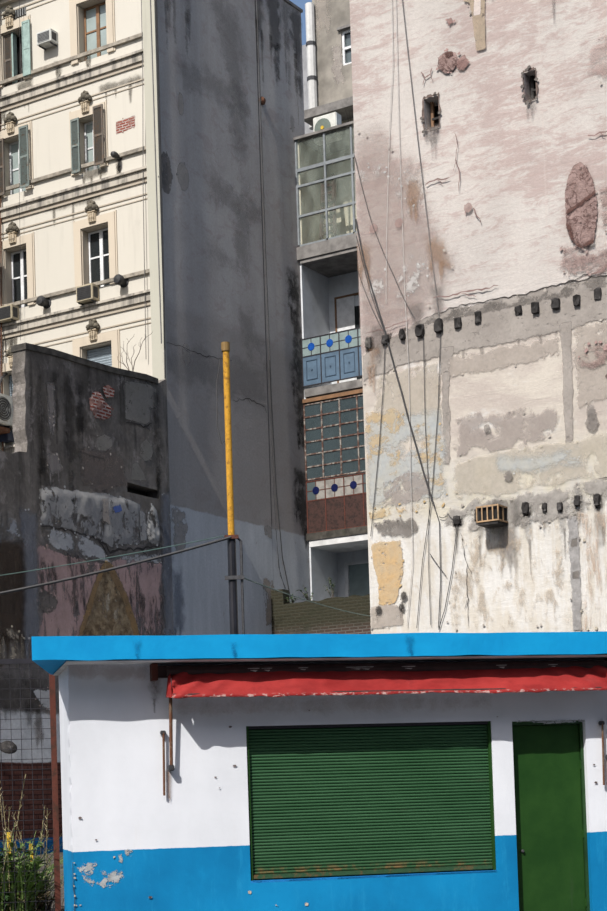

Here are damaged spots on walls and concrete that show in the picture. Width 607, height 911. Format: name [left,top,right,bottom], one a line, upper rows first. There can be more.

spalling [436,48,469,73]
damp [288,273,304,448]
damp [0,508,85,665]
damp [125,493,182,636]
peeling [371,541,407,611]
peeling [77,849,133,888]